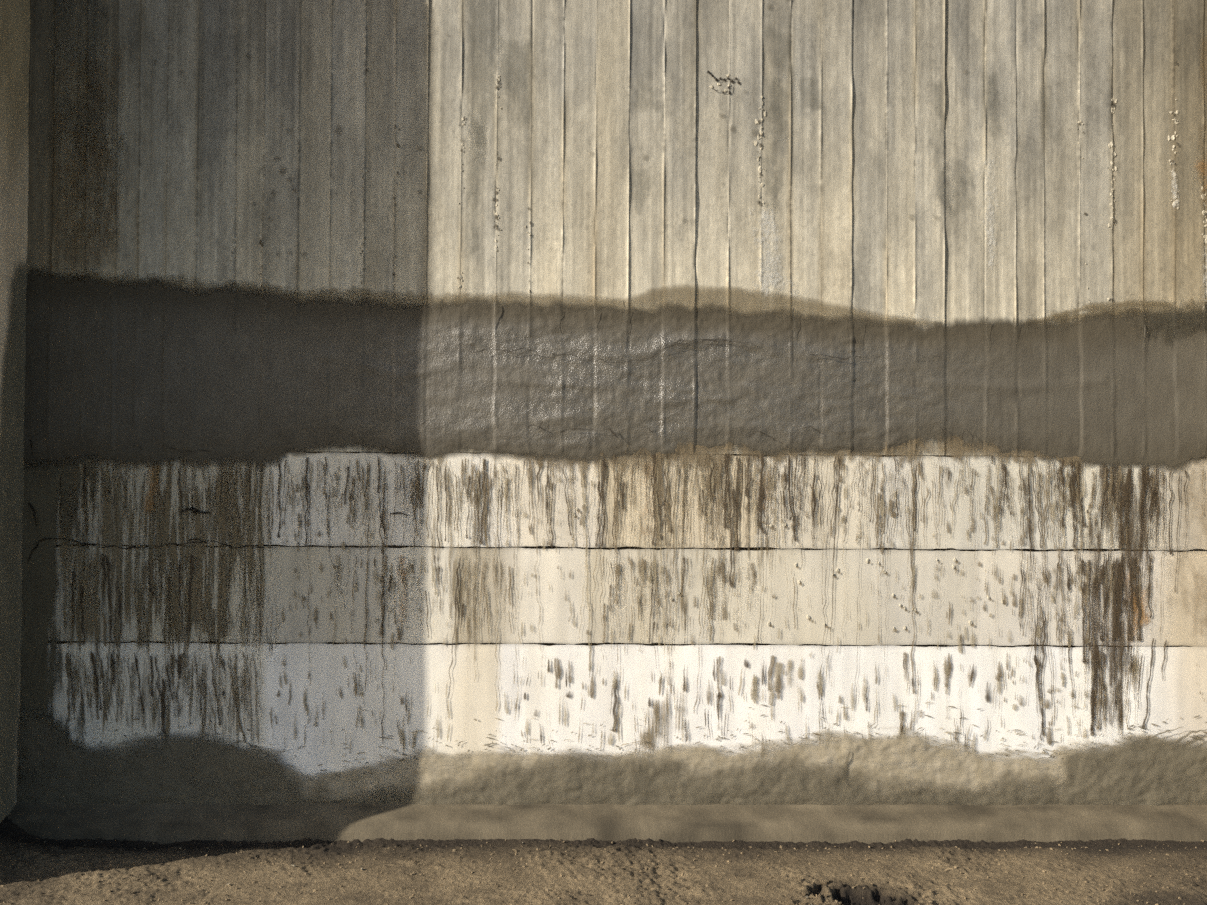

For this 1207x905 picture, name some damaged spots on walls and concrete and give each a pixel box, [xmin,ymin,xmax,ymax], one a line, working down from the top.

leakage [1035,302,1171,322]
crack [465,339,764,363]
leakage [54,452,1204,742]